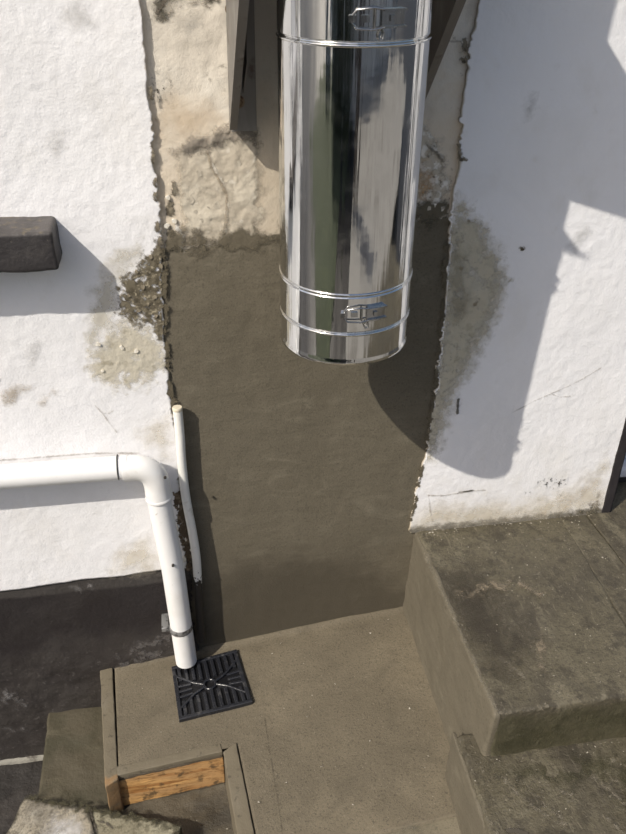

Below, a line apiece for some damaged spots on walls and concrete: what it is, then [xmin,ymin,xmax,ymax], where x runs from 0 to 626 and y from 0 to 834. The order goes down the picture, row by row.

flaking render [90,0,280,388]
peeling [417,0,502,446]